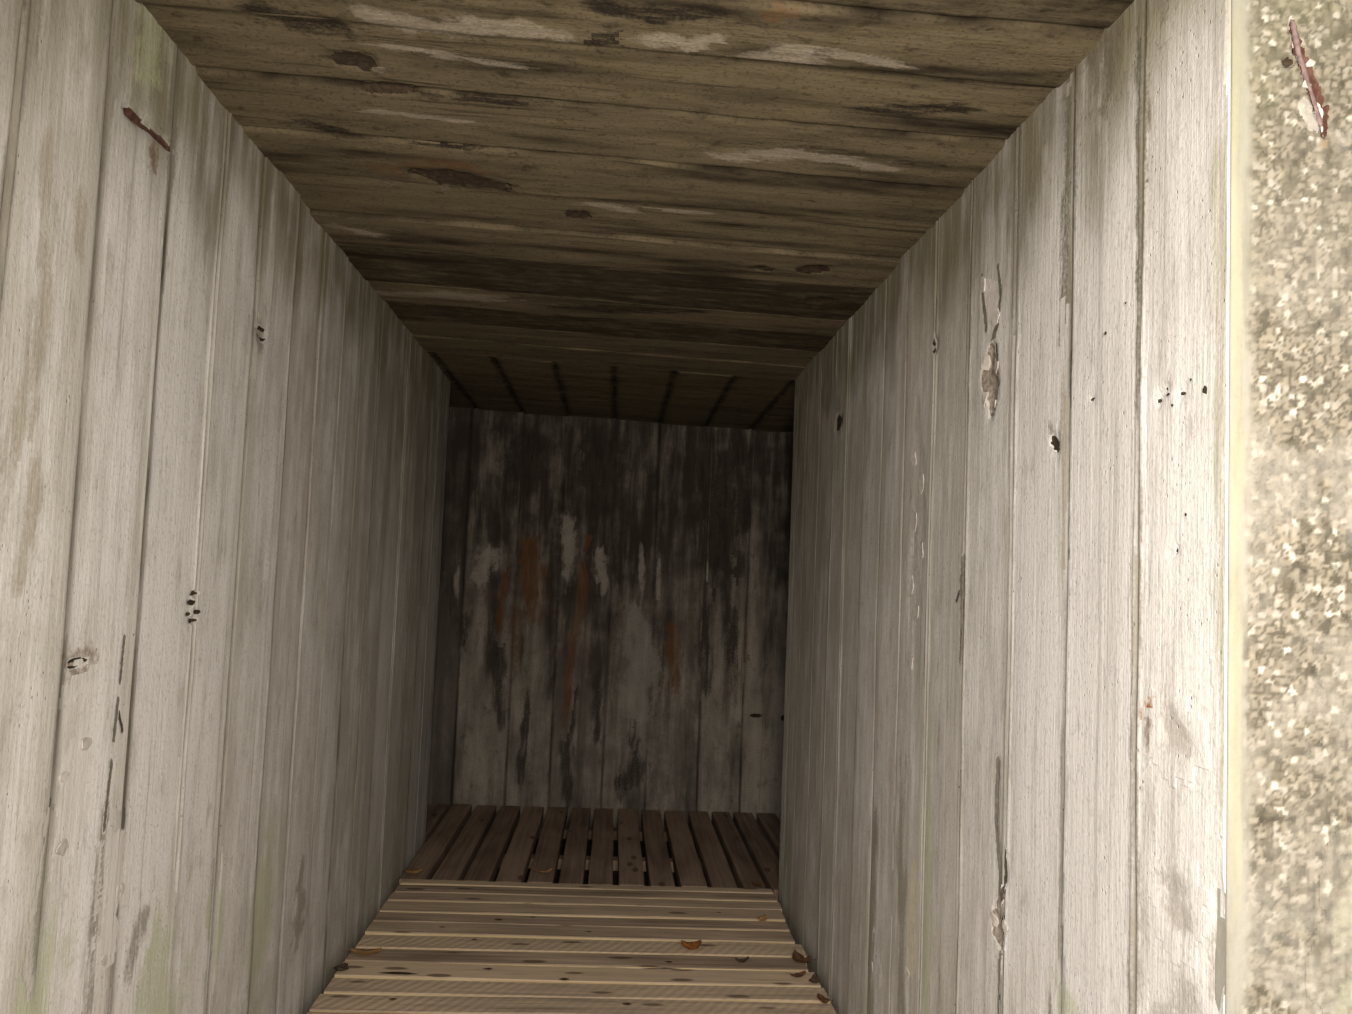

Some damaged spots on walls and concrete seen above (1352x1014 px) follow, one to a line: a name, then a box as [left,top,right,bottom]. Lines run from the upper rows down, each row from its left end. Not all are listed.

leakage [221,0,937,73]
leakage [264,86,616,155]
leakage [537,198,740,217]
leakage [675,142,940,175]
leakage [371,283,760,320]
peeling [978,261,1002,419]
leakage [812,0,1177,1014]
leakage [447,412,792,821]
leakage [22,798,57,1003]
leakage [73,780,114,1014]
leakage [284,841,310,973]